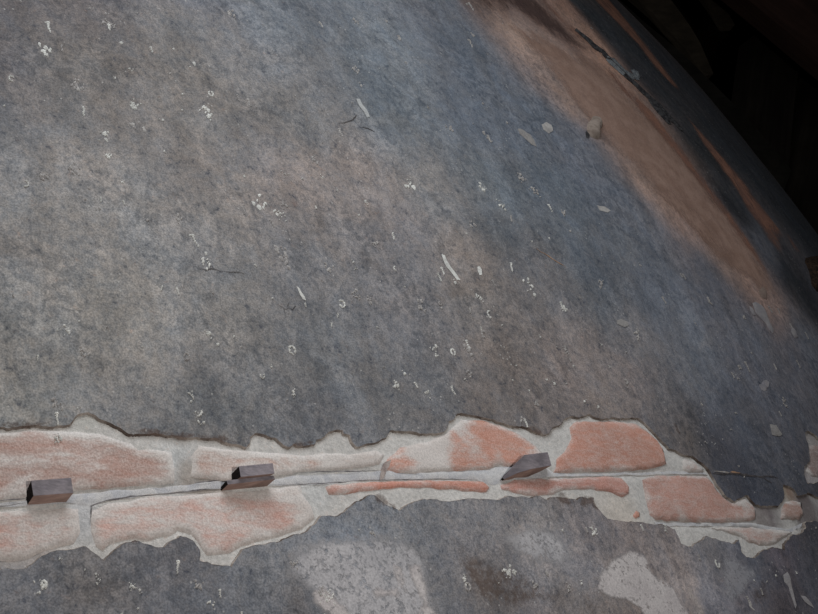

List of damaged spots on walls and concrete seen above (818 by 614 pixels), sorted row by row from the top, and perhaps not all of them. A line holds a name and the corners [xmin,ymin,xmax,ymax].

corrosion [597,0,675,86]
corrosion [523,32,779,288]
spalling [0,412,818,570]